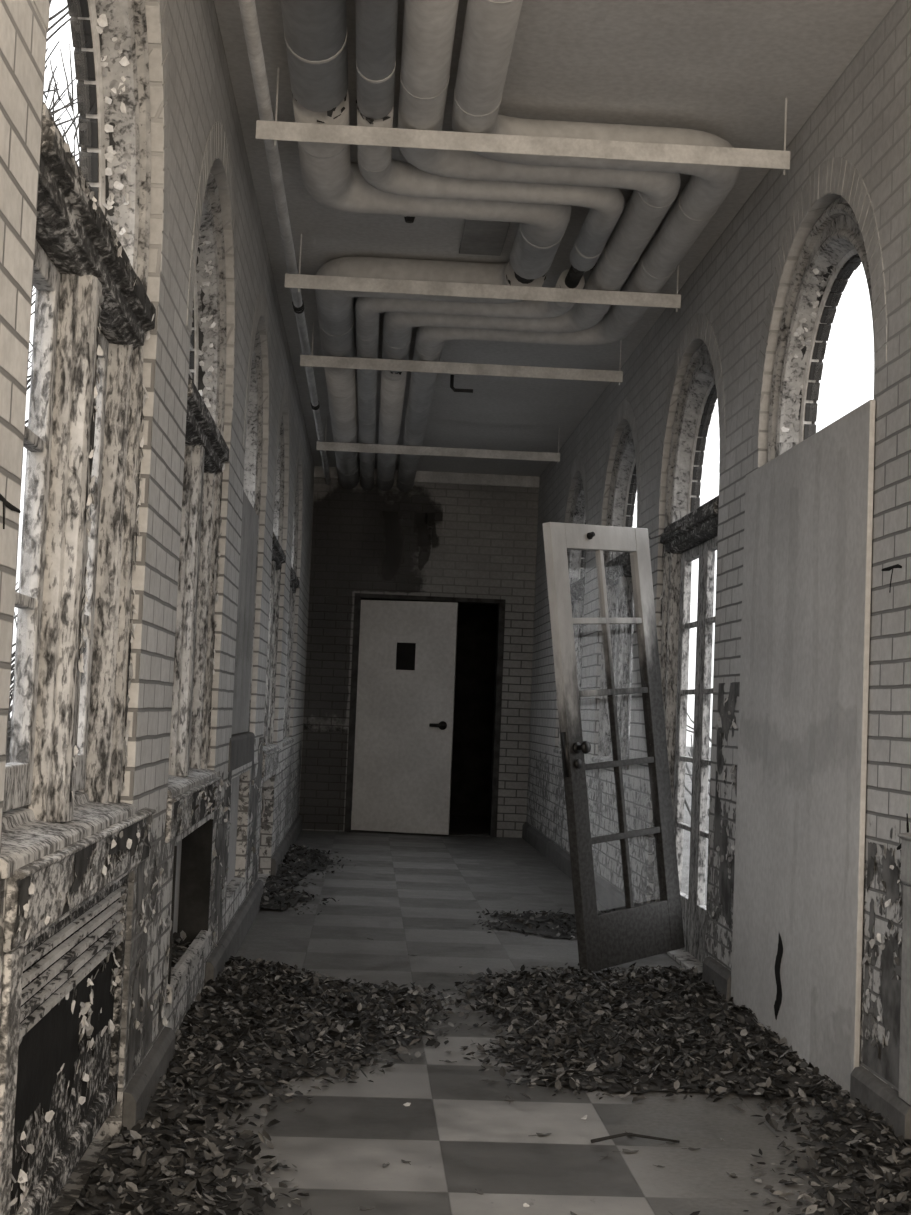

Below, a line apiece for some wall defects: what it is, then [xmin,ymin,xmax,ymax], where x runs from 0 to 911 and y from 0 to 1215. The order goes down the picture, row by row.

peeling [76,289,103,686]
peeling [134,383,149,567]
peeling [70,745,79,802]
peeling [122,587,137,791]
peeling [174,621,232,947]
peeling [245,737,266,897]
peeling [10,947,120,1214]
peeling [11,815,172,1082]
peeling [861,842,903,1089]